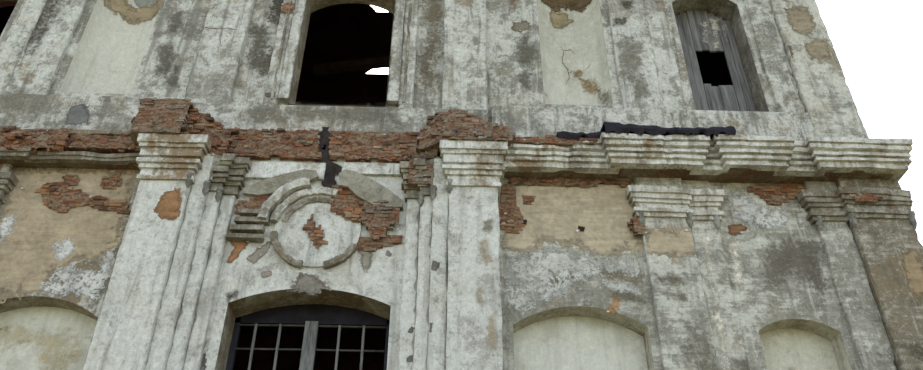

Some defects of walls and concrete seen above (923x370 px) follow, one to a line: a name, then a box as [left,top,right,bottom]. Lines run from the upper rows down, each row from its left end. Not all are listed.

peeling [104,0,162,25]
peeling [541,0,592,29]
spalling [0,97,598,188]
peeling [0,167,140,304]
peeling [153,188,182,220]
peeling [227,226,272,278]
spalling [234,195,271,215]
spalling [302,214,328,248]
spalling [330,185,404,272]
peeling [498,176,696,315]
peeling [899,248,923,302]